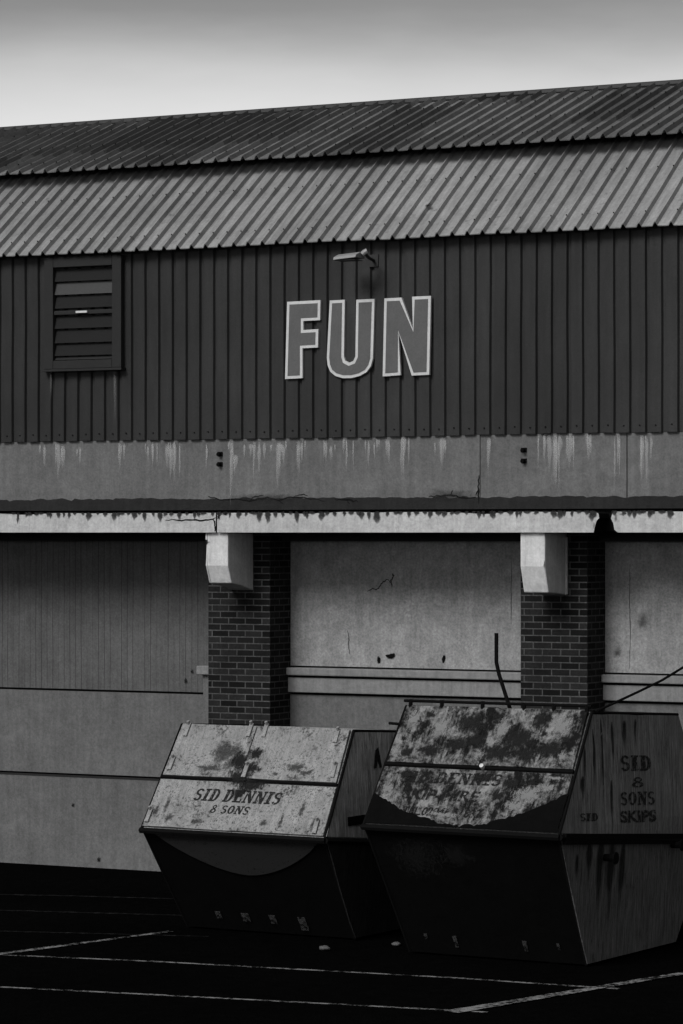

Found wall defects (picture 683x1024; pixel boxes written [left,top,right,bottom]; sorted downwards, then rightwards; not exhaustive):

crack [167,494,358,532]
damp [10,510,596,522]